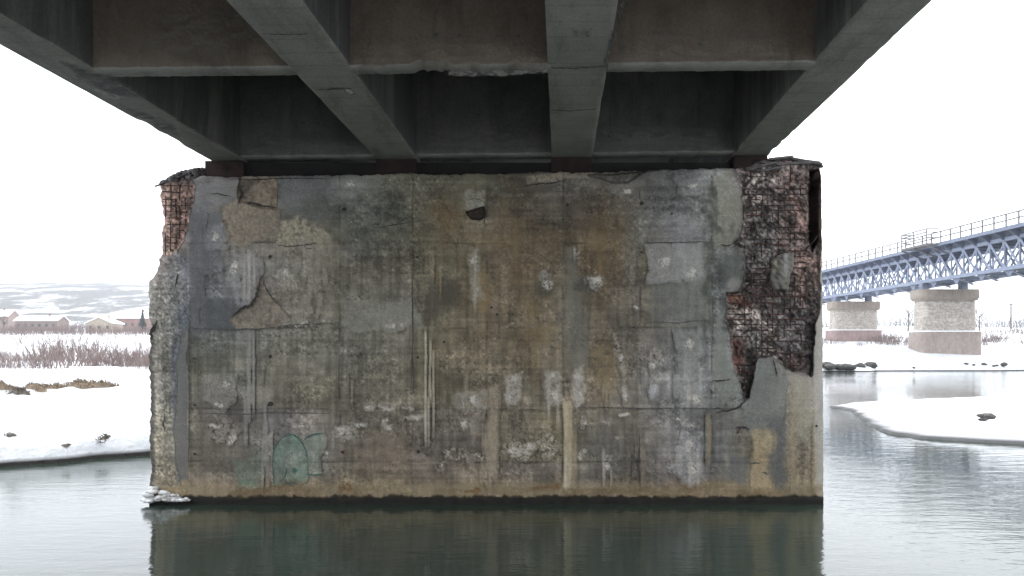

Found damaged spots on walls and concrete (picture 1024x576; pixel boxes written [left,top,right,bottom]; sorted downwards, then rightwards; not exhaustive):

spalling [449,69,547,77]
spalling [148,179,195,488]
crack [162,274,351,468]
peeling [230,176,335,331]
peeling [463,189,487,229]
leakage [328,175,818,499]
spalling [725,160,821,399]